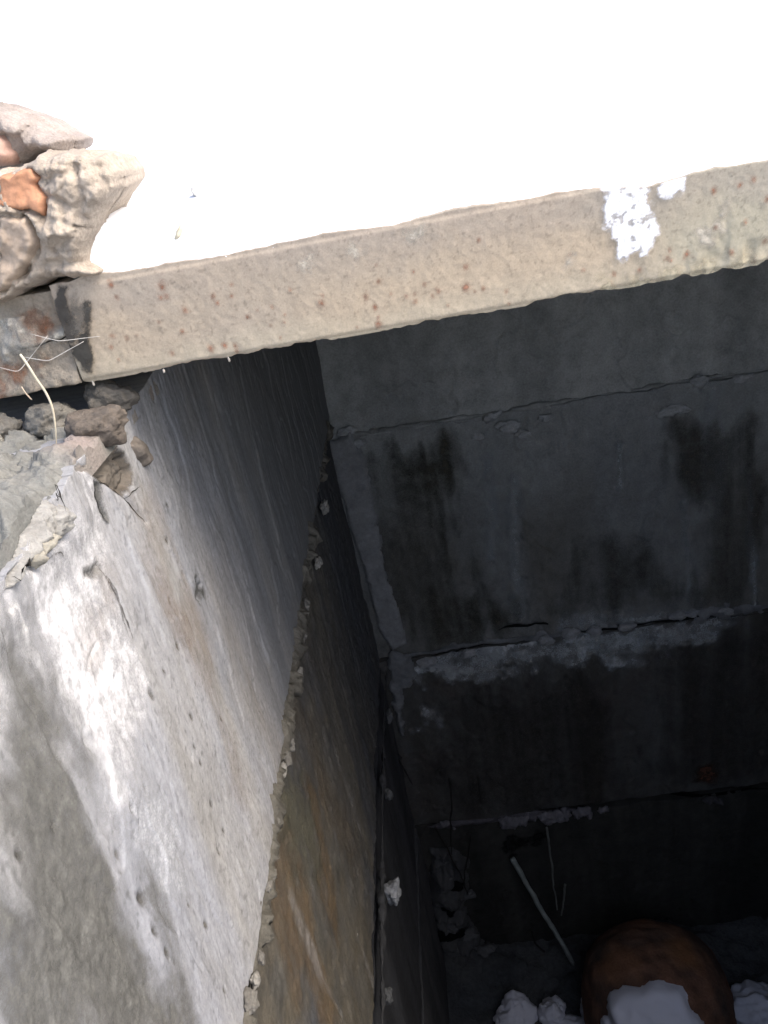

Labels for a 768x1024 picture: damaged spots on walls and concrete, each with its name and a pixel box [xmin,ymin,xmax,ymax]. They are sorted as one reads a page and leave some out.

spalling [92,436,154,523]
leakage [392,429,455,550]
leakage [671,418,764,606]
crack [434,622,548,655]
leakage [414,541,727,682]
crack [581,612,768,632]